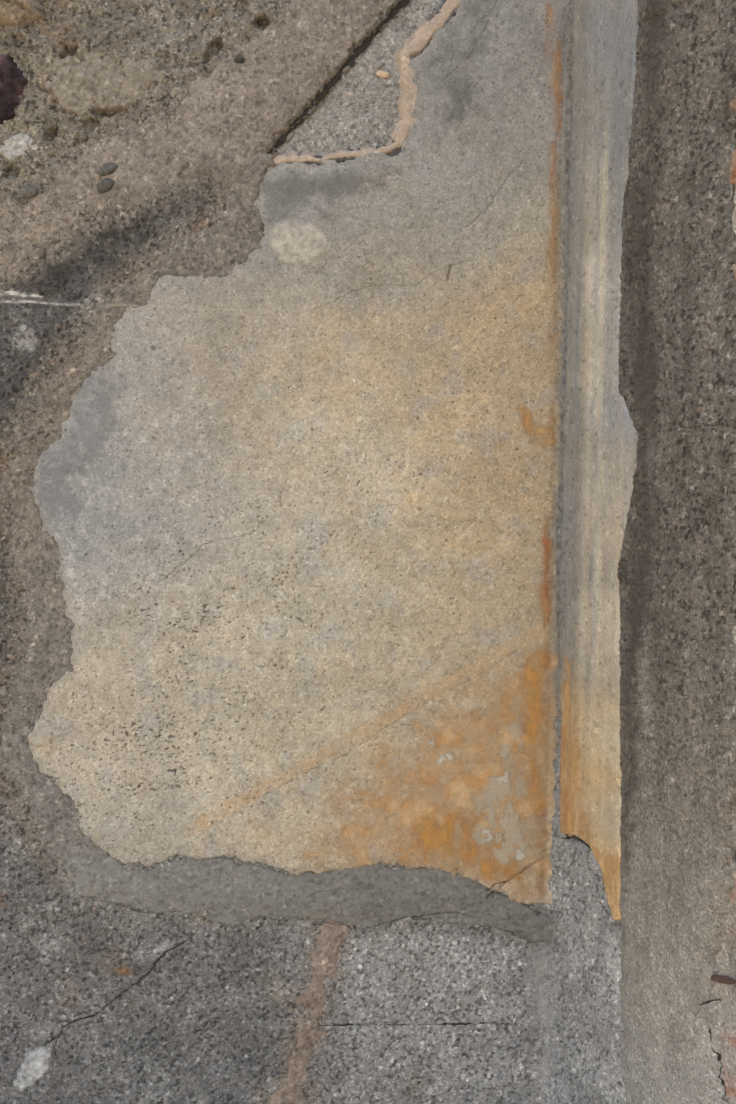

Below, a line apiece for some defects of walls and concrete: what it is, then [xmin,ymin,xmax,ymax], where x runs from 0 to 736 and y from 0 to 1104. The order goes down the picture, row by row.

spalling [275,0,443,156]
crack [39,934,195,1059]
crack [320,1020,514,1028]